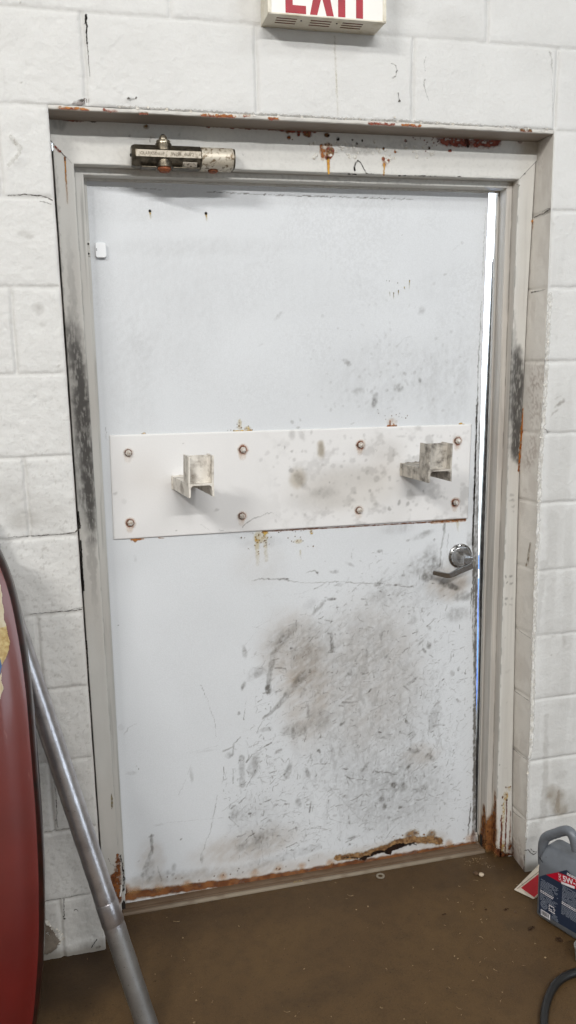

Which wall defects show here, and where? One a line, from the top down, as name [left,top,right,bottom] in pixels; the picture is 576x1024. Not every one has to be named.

rust [268,117,363,174]
rust [428,138,501,152]
rust [241,498,466,552]
rust [108,786,514,903]